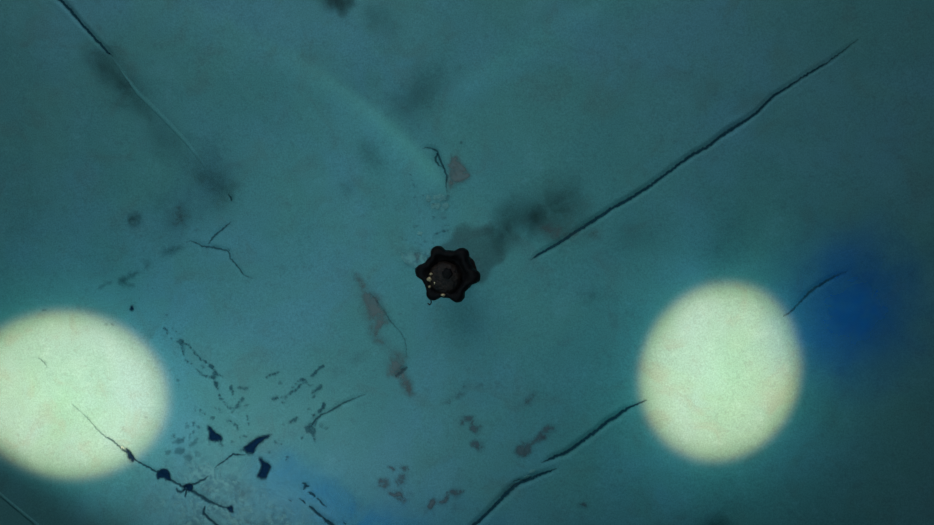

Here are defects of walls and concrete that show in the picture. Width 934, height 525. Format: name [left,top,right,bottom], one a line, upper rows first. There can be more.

crack [59,0,111,55]
crack [432,148,448,182]
crack [533,46,849,258]
crack [195,225,242,272]
crack [788,276,835,314]
crack [107,437,240,525]
crack [301,483,334,525]
crack [472,401,644,525]